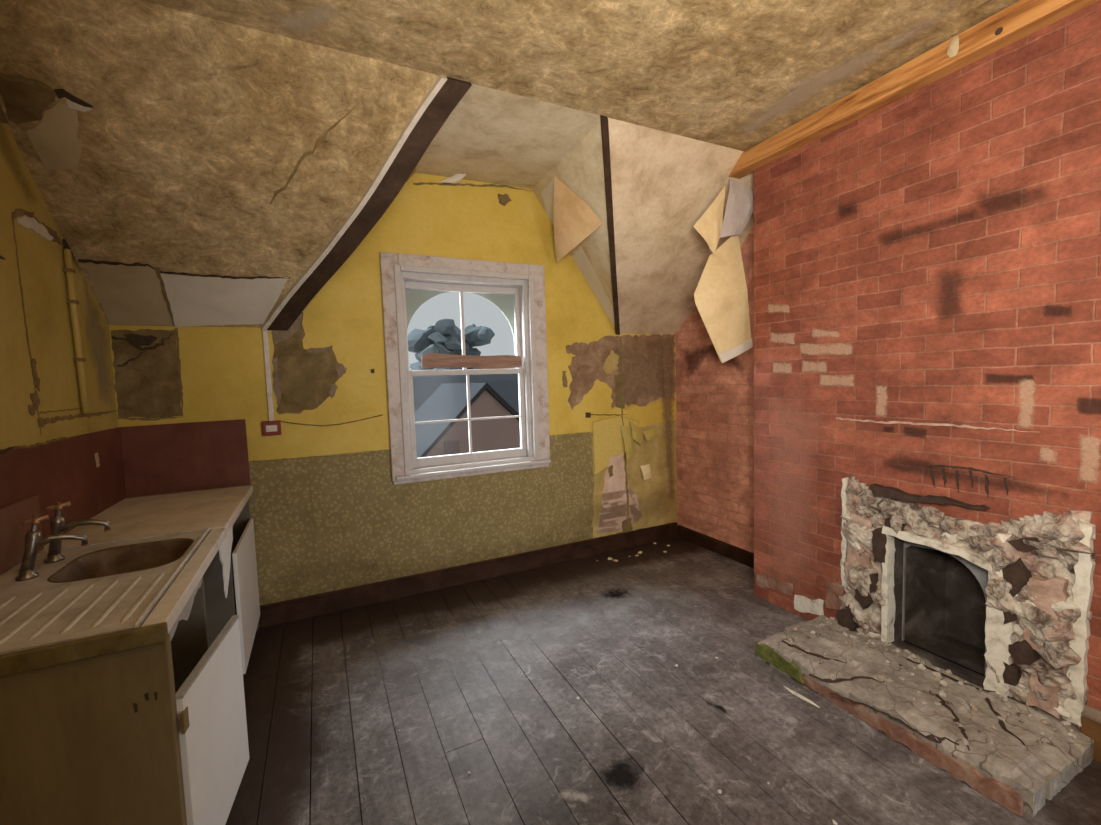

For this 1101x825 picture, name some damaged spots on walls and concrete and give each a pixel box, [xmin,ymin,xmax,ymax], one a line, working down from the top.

peeling [26,99,92,169]
crack [269,106,356,205]
flaking render [12,208,64,246]
flaking render [111,328,183,421]
spalling [272,312,347,414]
peeling [562,334,676,426]
flaking render [598,439,642,534]
spalling [870,483,991,510]
flaking render [1002,537,1070,620]
crack [782,640,1038,751]